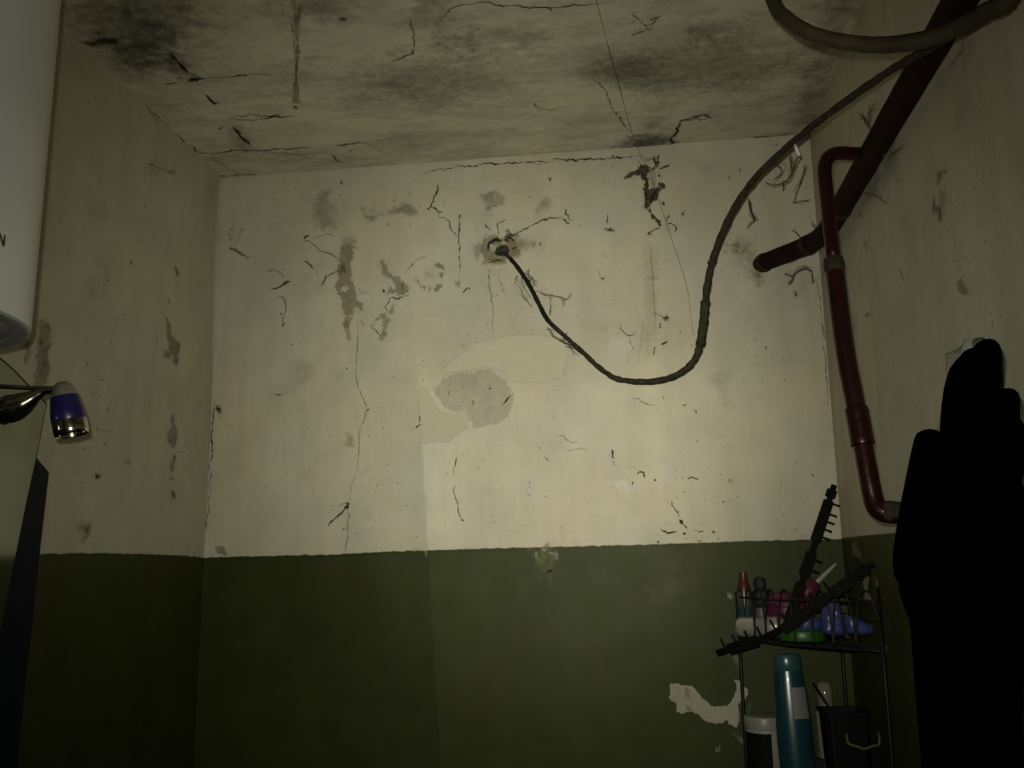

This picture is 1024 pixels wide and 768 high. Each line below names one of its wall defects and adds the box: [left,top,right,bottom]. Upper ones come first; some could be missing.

crack [441,2,602,19]
water stain [292,0,302,108]
crack [141,54,359,176]
crack [670,114,711,145]
crack [426,81,639,268]
flaking render [624,155,685,235]
crack [267,234,338,326]
flaking render [481,220,522,263]
flaking render [164,318,180,365]
crack [328,255,427,549]
crack [661,501,703,535]
peeling [669,680,748,741]